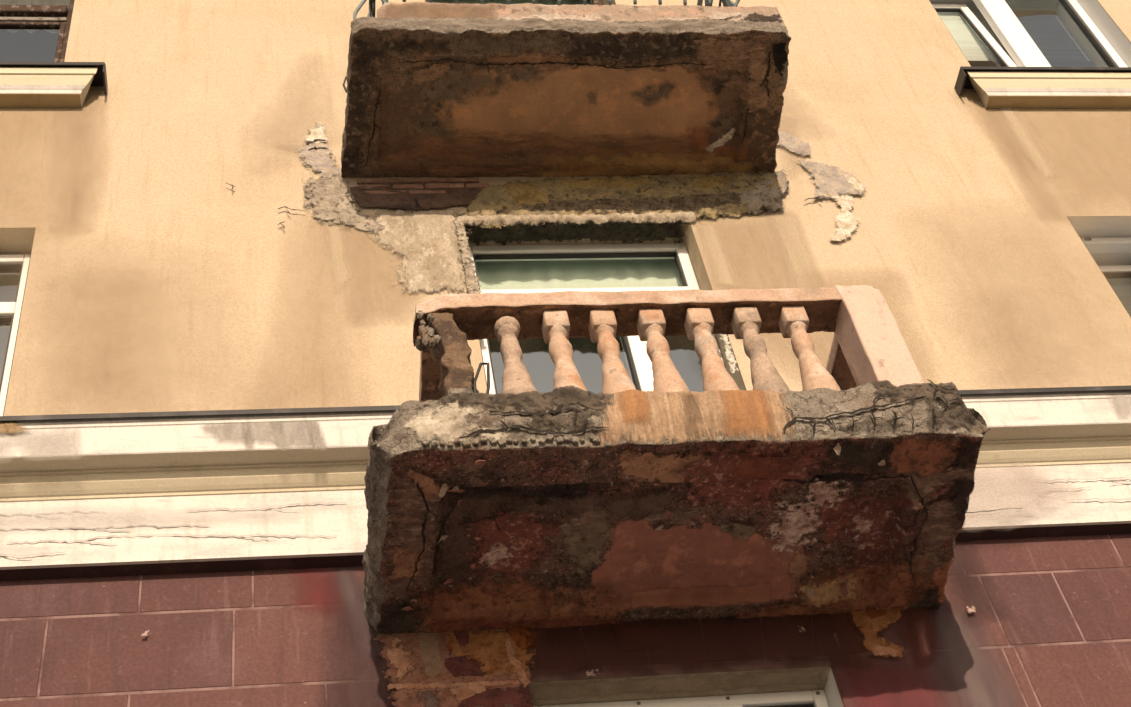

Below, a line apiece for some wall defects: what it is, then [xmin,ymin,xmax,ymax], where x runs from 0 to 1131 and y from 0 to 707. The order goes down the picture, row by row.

water stain [341,3,780,177]
crack [742,51,772,150]
flaking render [295,122,789,294]
peeling [777,130,866,242]
spalling [404,385,610,447]
crack [783,379,964,434]
peeling [387,469,465,611]
crack [407,482,622,591]
peeling [465,443,841,616]
peeling [871,380,976,603]
peeling [368,625,538,707]
peeling [850,607,903,658]